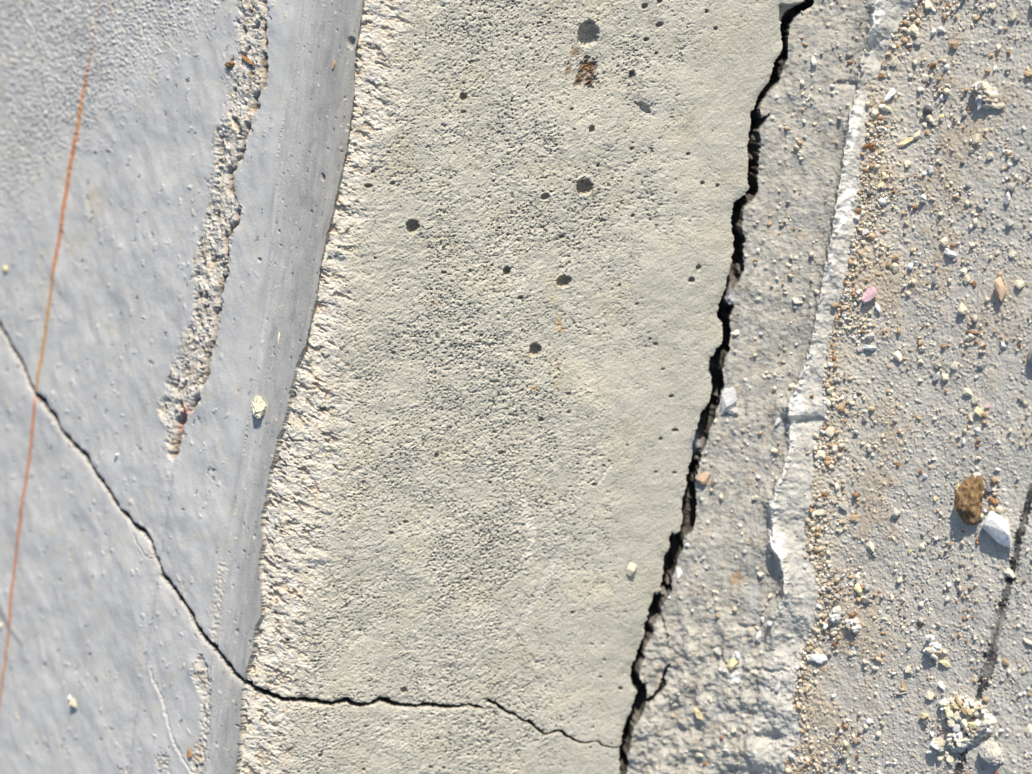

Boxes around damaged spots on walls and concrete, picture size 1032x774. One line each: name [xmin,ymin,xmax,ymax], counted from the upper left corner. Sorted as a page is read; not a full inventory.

spalling [156,0,271,461]
crack [0,0,814,774]